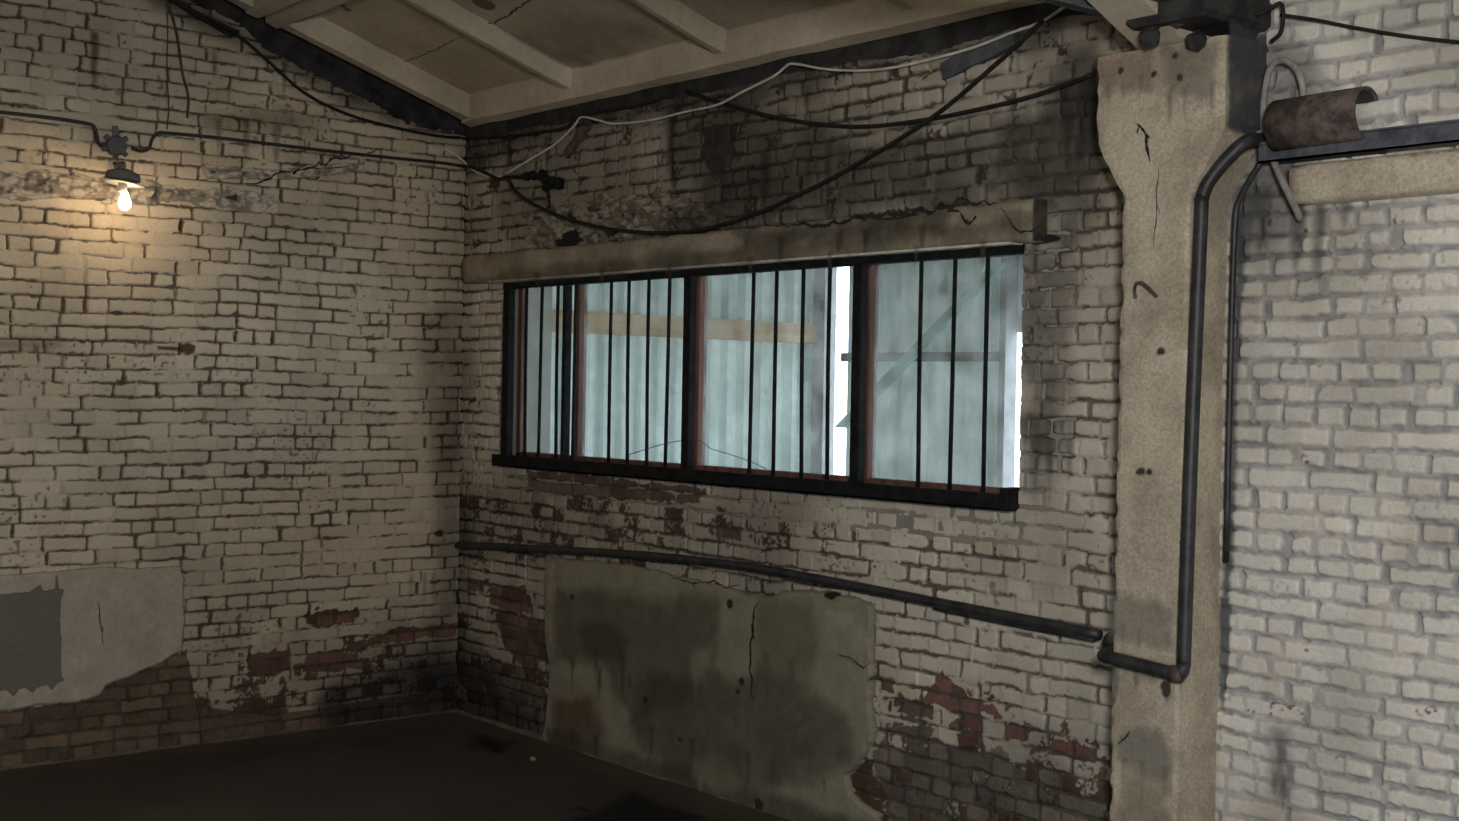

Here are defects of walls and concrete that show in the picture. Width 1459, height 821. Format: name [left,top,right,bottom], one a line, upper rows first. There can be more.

crack [404,0,530,62]
peeling [246,606,458,685]
peeling [467,577,547,685]
crack [668,574,758,701]
flaking render [0,649,447,767]
flaking render [869,670,1106,821]